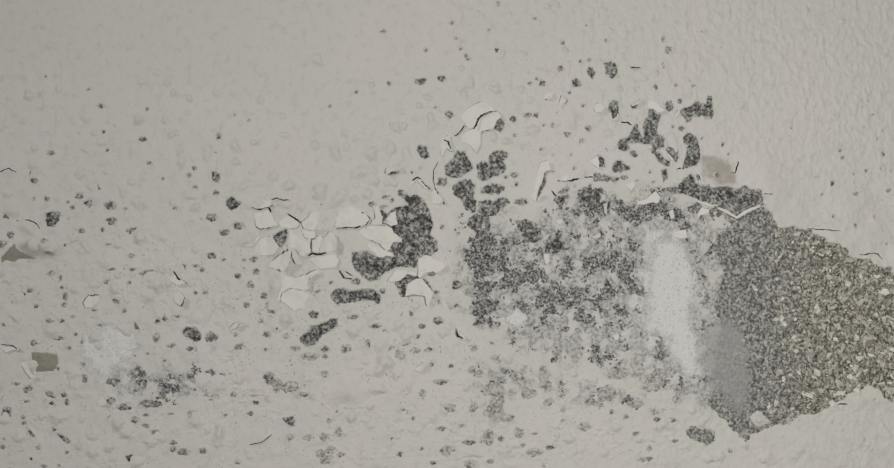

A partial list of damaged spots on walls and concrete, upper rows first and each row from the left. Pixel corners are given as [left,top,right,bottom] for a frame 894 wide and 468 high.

peeling [212,172,241,210]
peeling [0,232,35,262]
peeling [45,212,60,227]
peeling [101,202,126,233]
peeling [219,222,245,236]
peeling [235,84,894,468]
peeling [45,271,75,323]
peeling [14,340,59,403]
peeling [2,407,40,461]